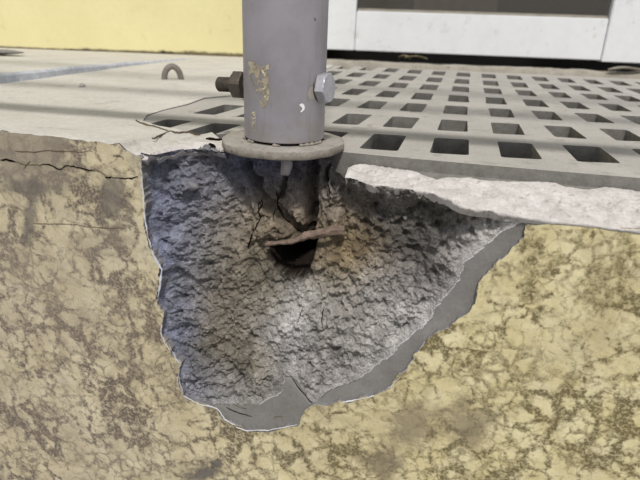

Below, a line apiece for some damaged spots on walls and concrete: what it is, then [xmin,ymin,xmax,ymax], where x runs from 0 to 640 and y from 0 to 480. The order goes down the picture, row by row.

crack [1,150,137,179]
crack [248,190,301,247]
corrosion [264,225,347,246]
spalling [139,149,532,432]